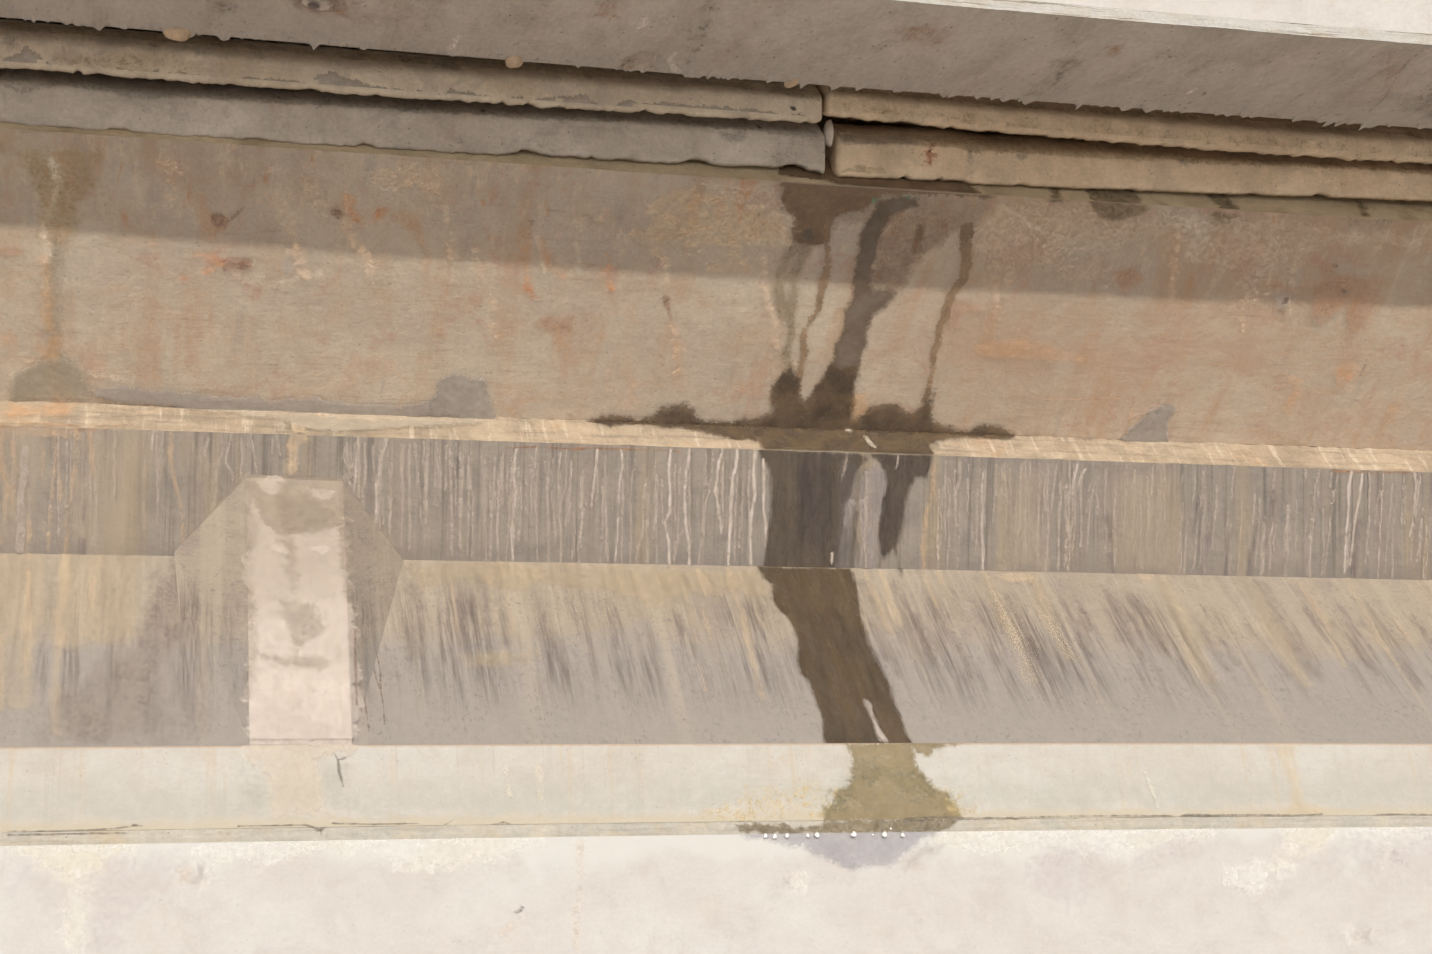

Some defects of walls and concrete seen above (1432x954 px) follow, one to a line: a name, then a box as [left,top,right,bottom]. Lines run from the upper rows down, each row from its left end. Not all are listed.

damp [203,424,307,504]
damp [342,158,1432,900]